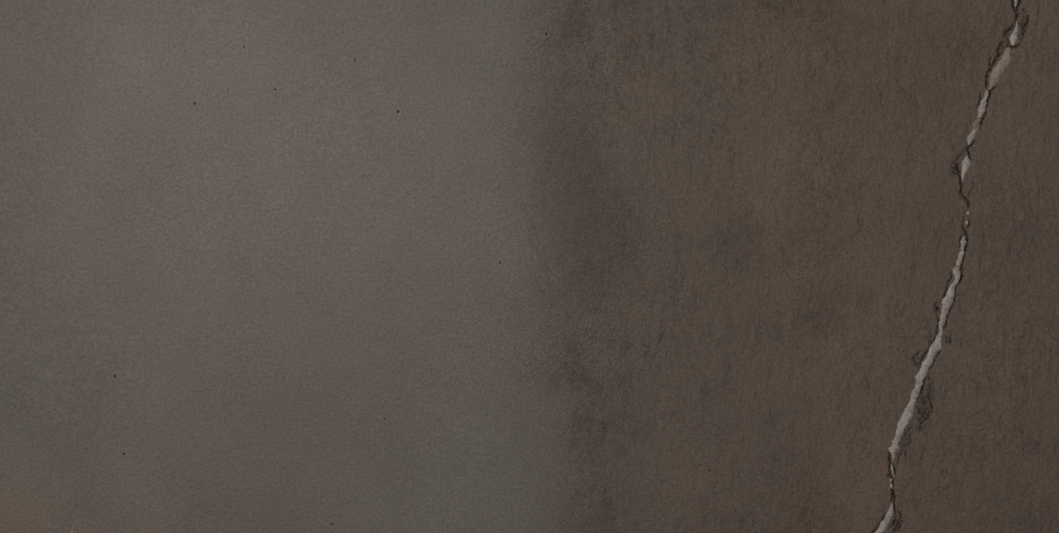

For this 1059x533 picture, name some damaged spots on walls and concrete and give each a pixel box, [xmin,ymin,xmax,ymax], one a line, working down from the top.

crack [872,0,1029,533]